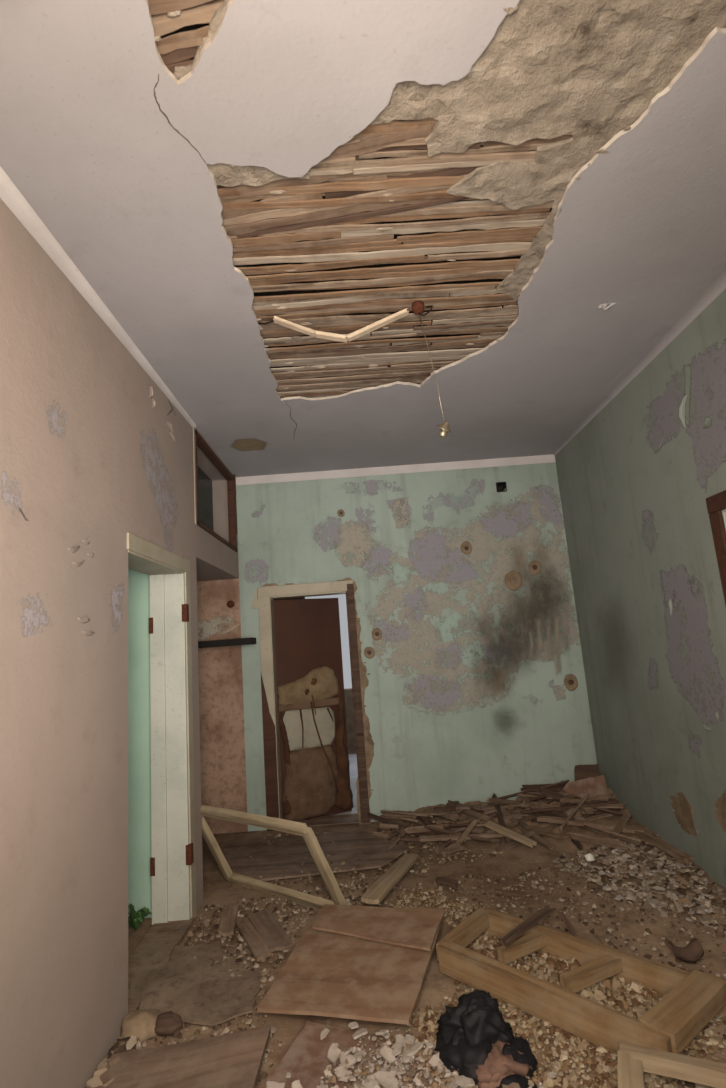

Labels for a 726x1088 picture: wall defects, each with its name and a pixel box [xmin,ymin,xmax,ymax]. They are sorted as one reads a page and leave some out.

flaking render [148,0,230,80]
crack [154,74,206,163]
flaking render [208,0,726,398]
peeling [314,479,580,825]
water stain [489,580,568,681]
flaking render [670,792,698,836]